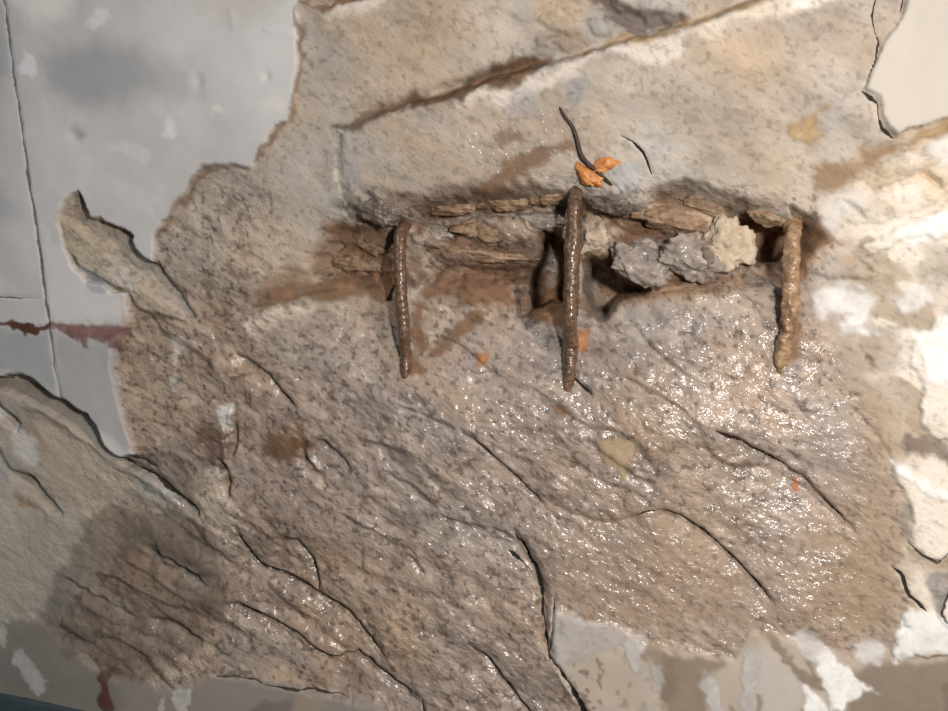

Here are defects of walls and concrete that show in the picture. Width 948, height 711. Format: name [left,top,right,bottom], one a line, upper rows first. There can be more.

spalling [339,0,939,213]
crack [861,0,894,139]
crack [0,0,81,411]
rust [0,320,131,351]
rust [746,216,785,251]
rust [800,220,830,281]
leakage [814,286,873,335]
peeling [792,117,948,491]
leakage [911,316,948,387]
peeling [888,474,948,618]
crack [509,531,587,711]
leakage [768,611,948,711]